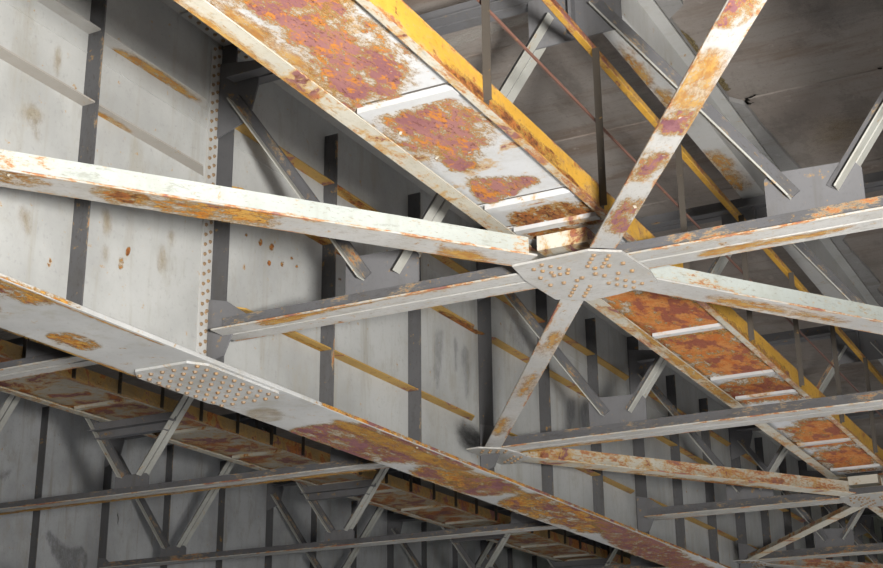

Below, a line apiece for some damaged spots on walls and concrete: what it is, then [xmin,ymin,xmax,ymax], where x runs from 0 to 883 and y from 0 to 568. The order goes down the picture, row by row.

corrosion [716,0,760,28]
corrosion [174,0,324,110]
corrosion [623,49,721,136]
corrosion [0,170,50,187]
corrosion [631,151,673,181]
corrosion [706,152,743,191]
corrosion [94,186,282,237]
corrosion [603,198,645,234]
corrosion [0,276,163,345]
corrosion [601,290,842,405]
corrosion [785,417,883,473]
corrosion [0,402,731,568]